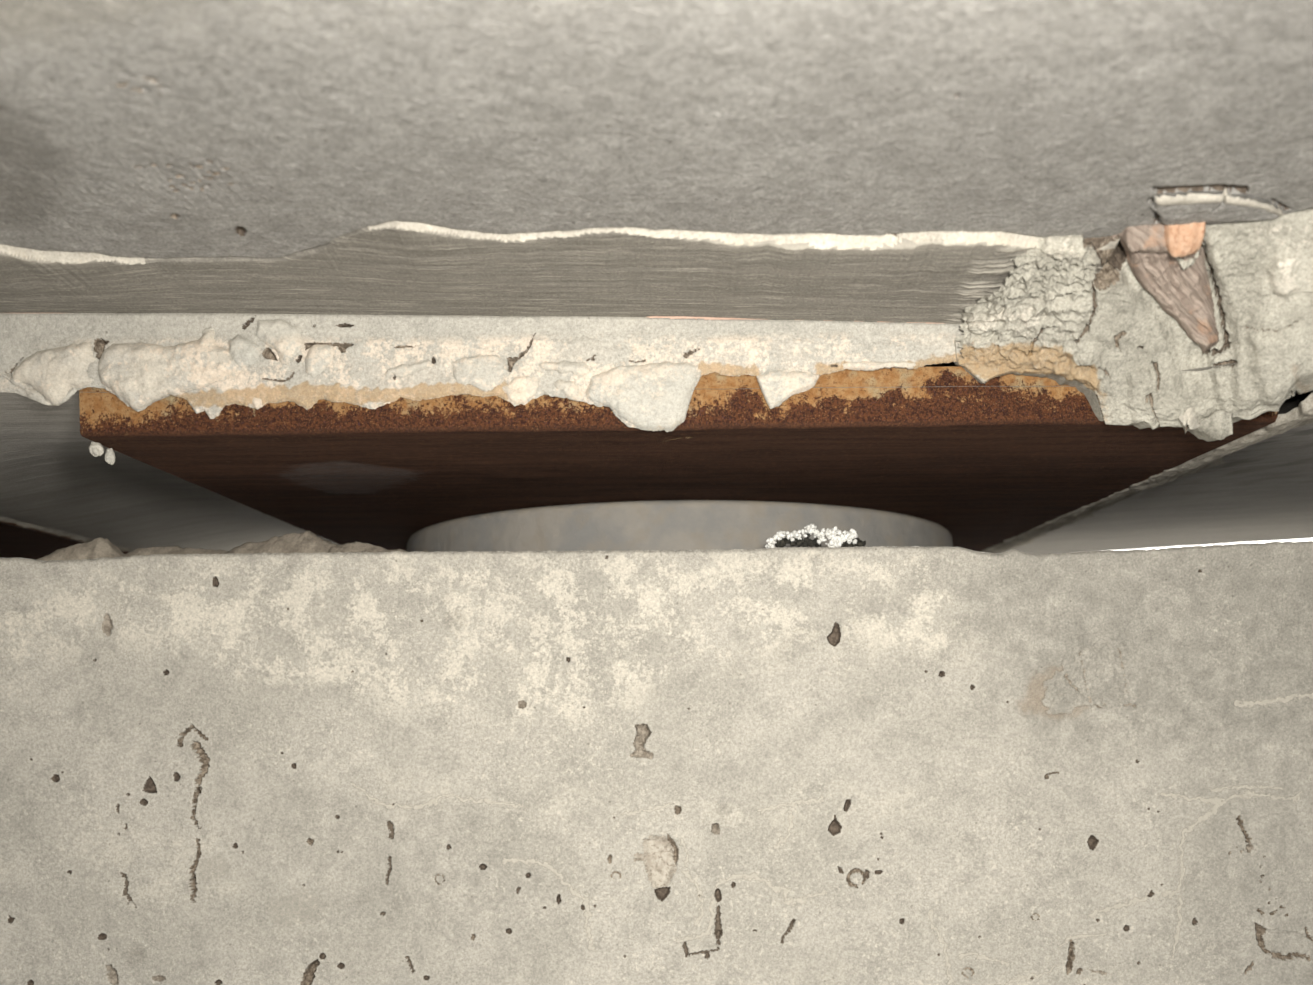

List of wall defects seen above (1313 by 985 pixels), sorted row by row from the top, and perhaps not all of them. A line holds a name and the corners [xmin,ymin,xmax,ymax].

spalling [1082,235,1127,291]